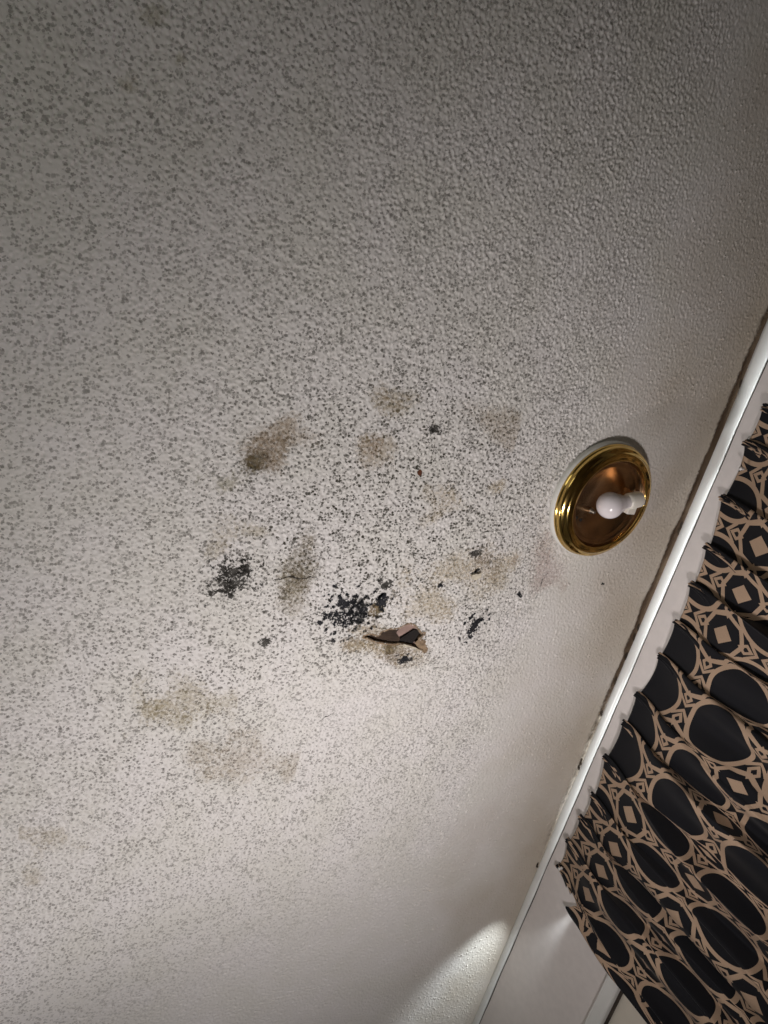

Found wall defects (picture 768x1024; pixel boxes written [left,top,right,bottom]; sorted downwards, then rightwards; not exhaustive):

mould [197,546,267,607]
mould [315,577,394,643]
mould [454,609,491,644]